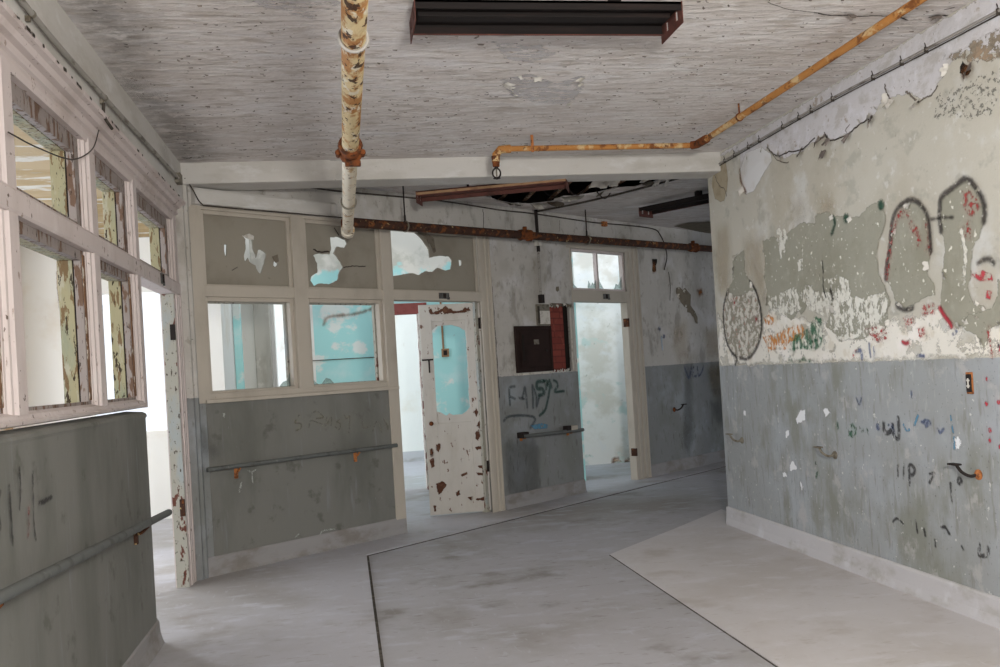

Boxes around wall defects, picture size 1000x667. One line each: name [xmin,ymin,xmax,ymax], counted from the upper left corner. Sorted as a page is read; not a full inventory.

peeling [711,0,1000,202]
peeling [429,306,471,315]
spalling [676,287,698,323]
peeling [717,176,1000,366]